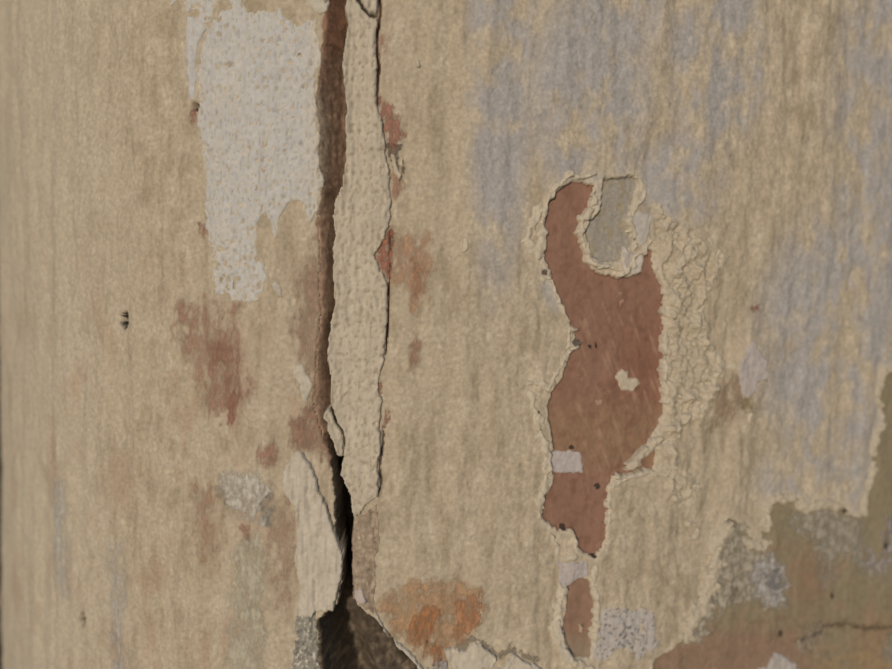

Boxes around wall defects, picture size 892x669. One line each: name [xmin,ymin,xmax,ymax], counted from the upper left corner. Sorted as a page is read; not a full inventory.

crack [313,0,382,618]
peeling [168,0,542,669]
crack [377,430,385,493]
crack [385,236,393,351]
peeling [520,170,671,669]
peeling [738,340,768,399]
peeling [653,366,892,669]